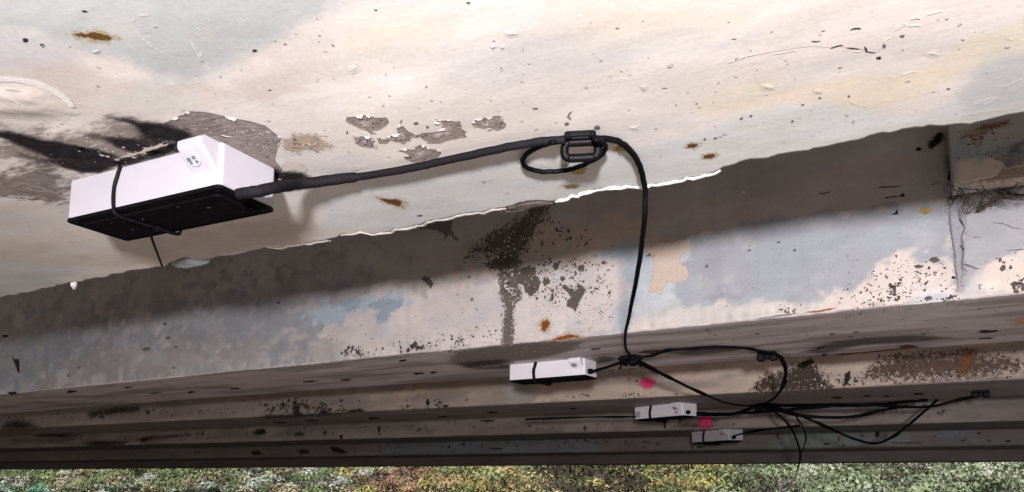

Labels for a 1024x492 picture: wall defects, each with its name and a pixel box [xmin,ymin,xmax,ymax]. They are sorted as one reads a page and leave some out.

corrosion [73,30,120,43]
spalling [165,111,332,178]
peeling [345,115,506,163]
water stain [946,131,1024,214]
corrosion [379,198,408,209]
water stain [309,204,614,357]
peeling [646,237,691,295]
crack [945,199,1024,292]
corrosion [538,318,586,341]